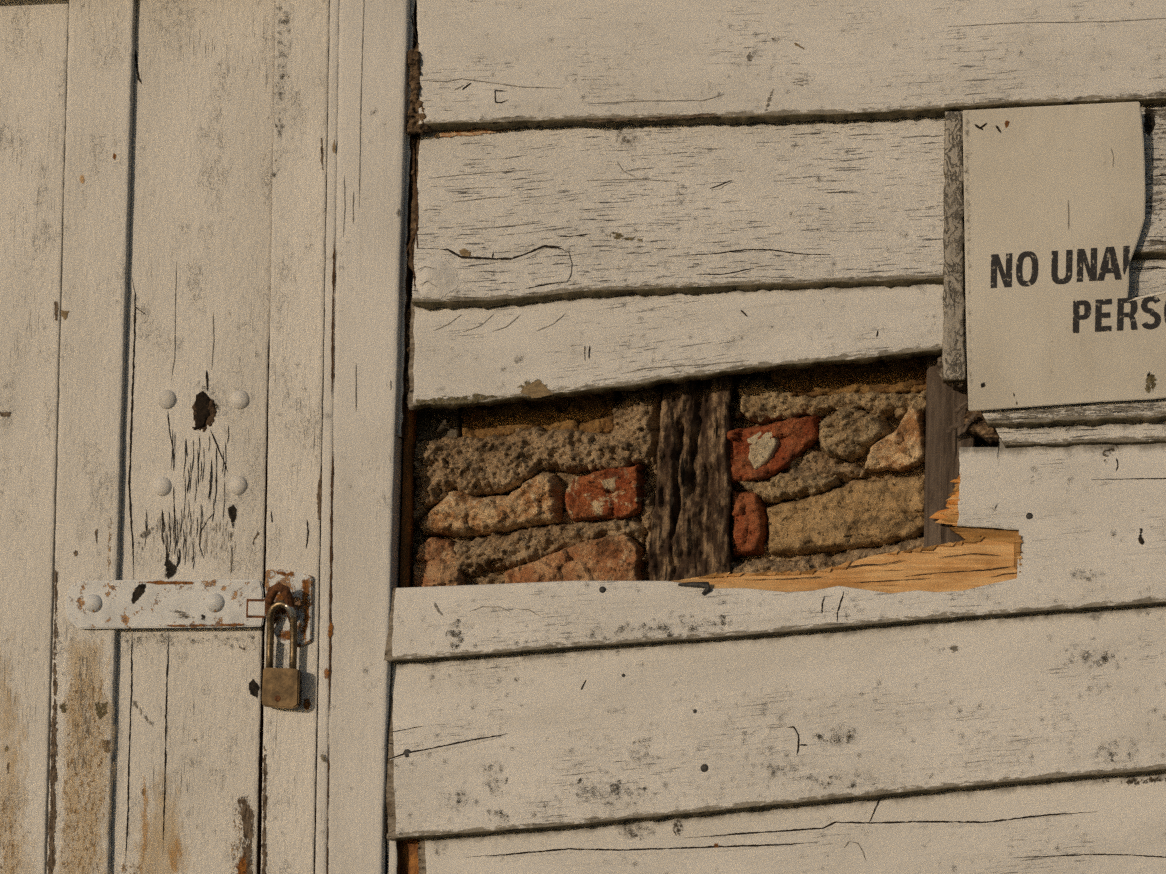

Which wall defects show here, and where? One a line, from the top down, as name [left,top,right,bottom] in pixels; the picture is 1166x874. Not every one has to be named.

crack [405,135,591,288]
crack [434,312,567,332]
peeling [416,393,497,405]
peeling [520,380,553,398]
spalling [747,432,780,470]
corrosion [276,571,310,641]
peeling [46,569,111,874]
crack [386,726,508,760]
crack [473,799,1097,860]
corrosion [235,854,247,874]
crack [1016,852,1166,860]